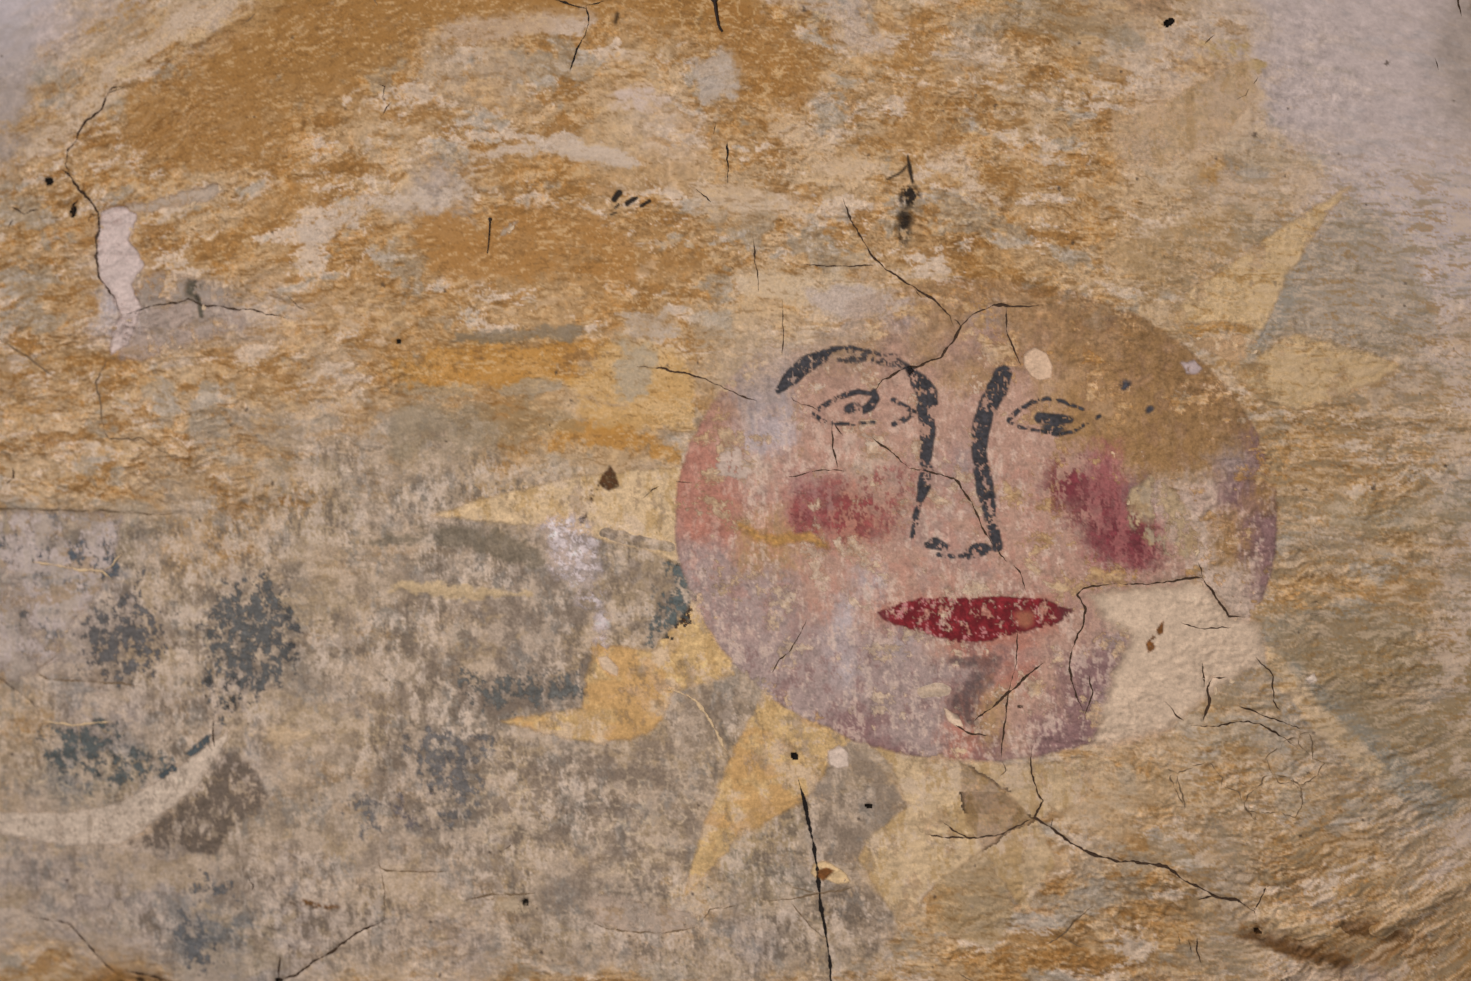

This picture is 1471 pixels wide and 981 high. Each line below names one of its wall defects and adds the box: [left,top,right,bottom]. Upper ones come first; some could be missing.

crack [557,0,604,69]
crack [8,86,306,318]
flaking render [96,184,242,358]
crack [753,240,784,351]
crack [807,203,1038,389]
crack [641,366,756,401]
crack [790,399,1025,588]
crack [928,562,1268,920]
crack [1164,659,1325,818]
crack [35,917,168,981]
crack [278,860,444,981]
crack [597,780,852,981]